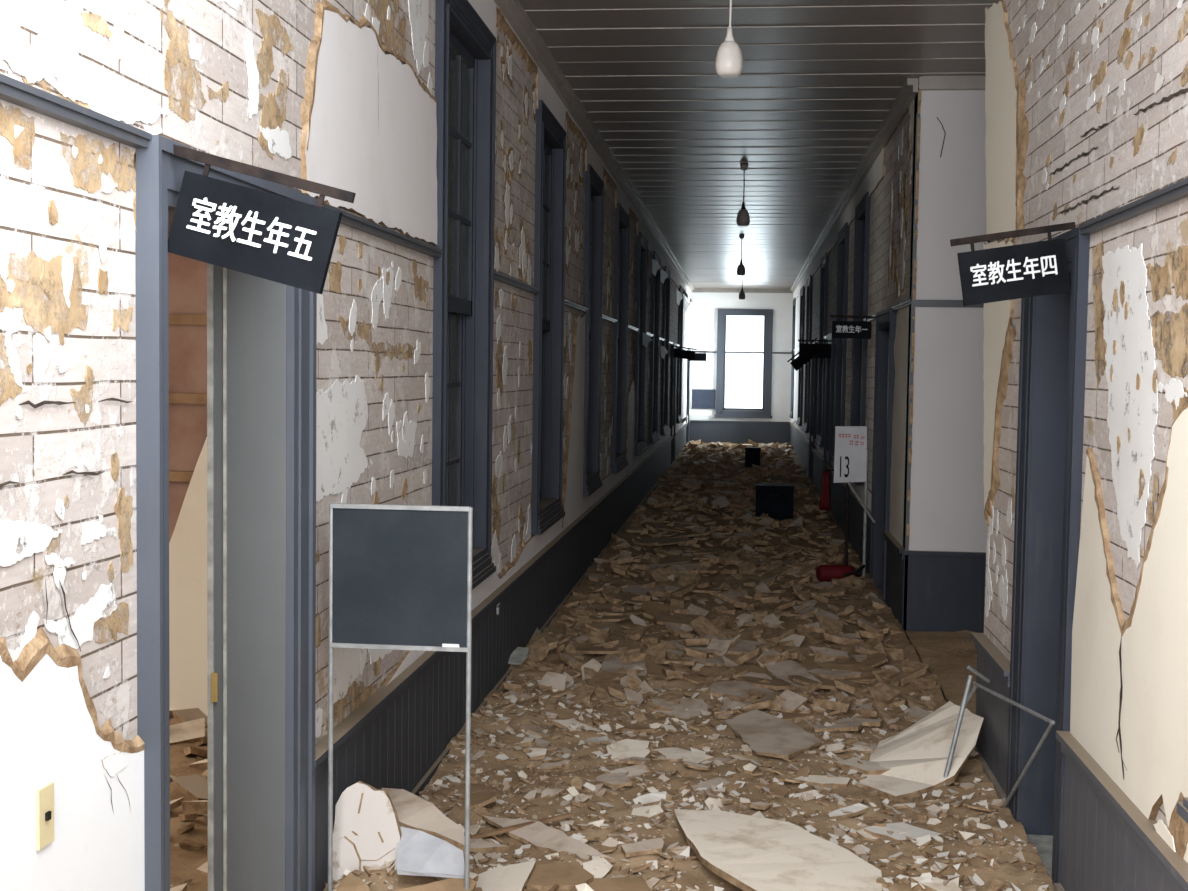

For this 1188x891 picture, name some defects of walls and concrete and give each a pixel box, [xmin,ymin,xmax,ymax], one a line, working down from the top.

flaking render [0,99,145,777]
flaking render [0,0,437,198]
flaking render [315,207,434,744]
flaking render [491,6,538,578]
flaking render [1001,0,1188,636]
flaking render [1154,792,1188,859]